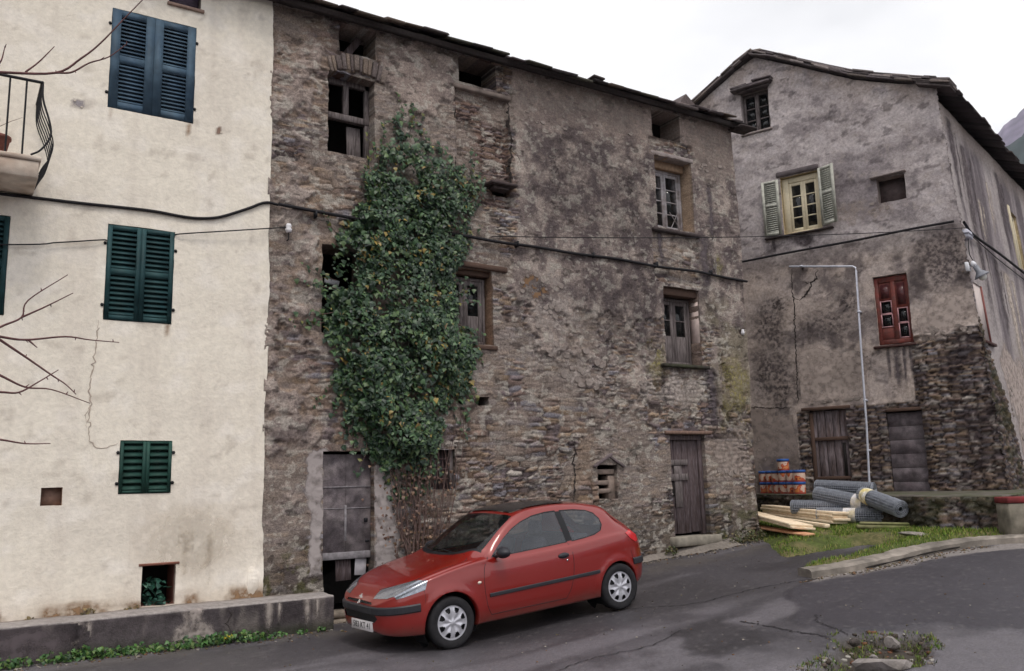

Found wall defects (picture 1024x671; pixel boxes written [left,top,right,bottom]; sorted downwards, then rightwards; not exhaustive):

crack [85,320,118,449]
crack [751,269,818,409]
crack [570,440,581,501]